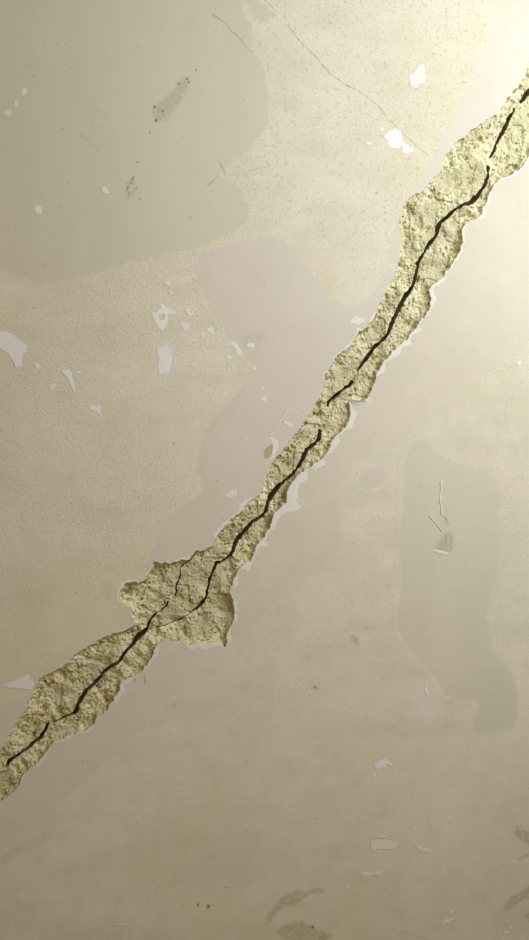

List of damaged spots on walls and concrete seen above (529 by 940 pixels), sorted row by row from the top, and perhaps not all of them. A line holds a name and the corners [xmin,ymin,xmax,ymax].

crack [326,88,529,407]
crack [5,429,322,767]
spalling [0,64,529,801]